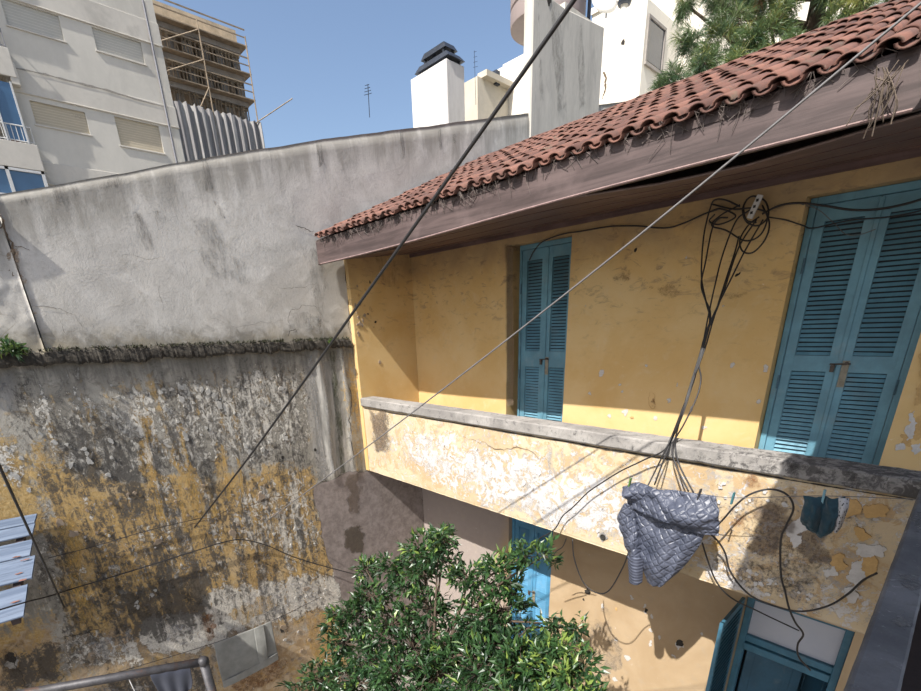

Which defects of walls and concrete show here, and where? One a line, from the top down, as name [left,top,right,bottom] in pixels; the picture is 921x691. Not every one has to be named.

peeling [895,353,921,455]
leakage [344,526,364,553]
peeling [782,502,807,548]
peeling [823,499,890,604]
peeling [714,561,783,603]